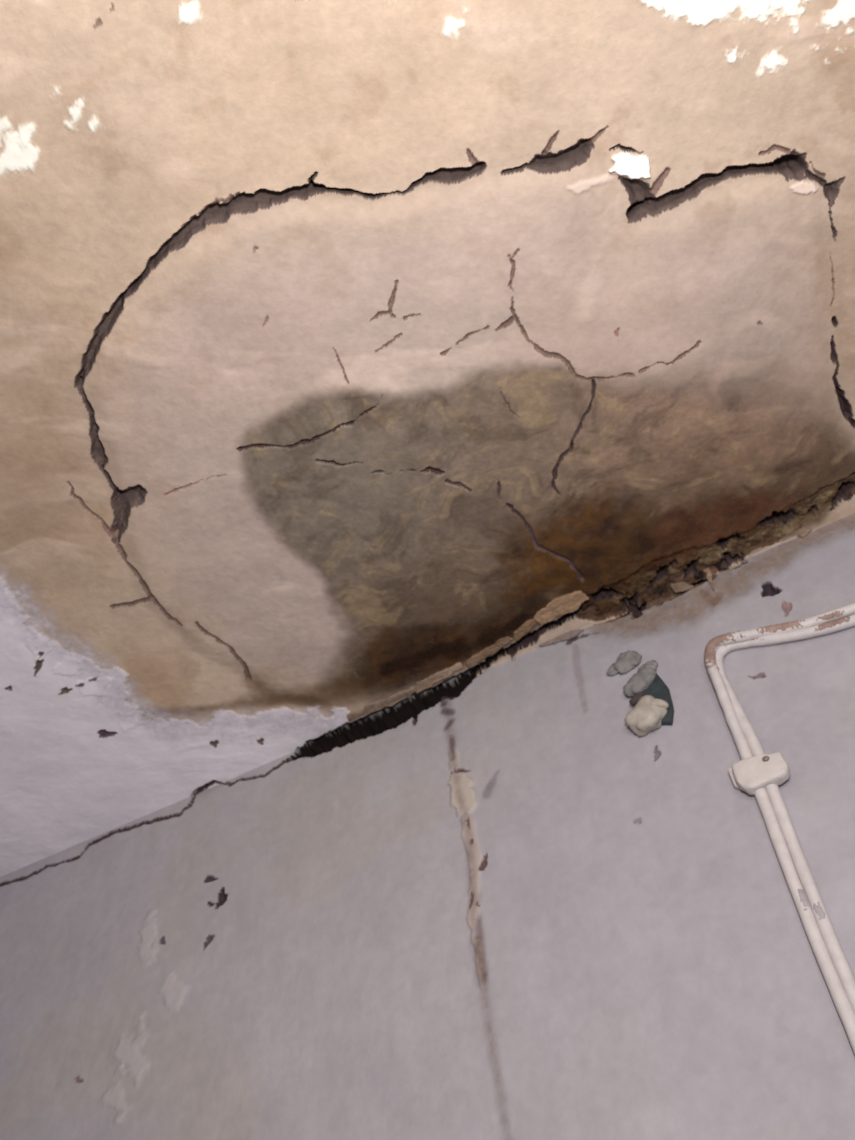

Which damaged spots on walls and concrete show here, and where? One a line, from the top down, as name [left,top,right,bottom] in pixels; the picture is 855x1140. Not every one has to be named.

peeling [177,0,201,26]
peeling [441,15,467,38]
peeling [641,0,811,35]
peeling [822,0,855,36]
peeling [755,50,789,78]
peeling [0,115,42,176]
peeling [62,97,100,134]
flaking render [500,125,651,195]
crack [617,143,855,429]
crack [439,248,702,494]
crack [0,148,601,887]
water stain [245,367,855,702]